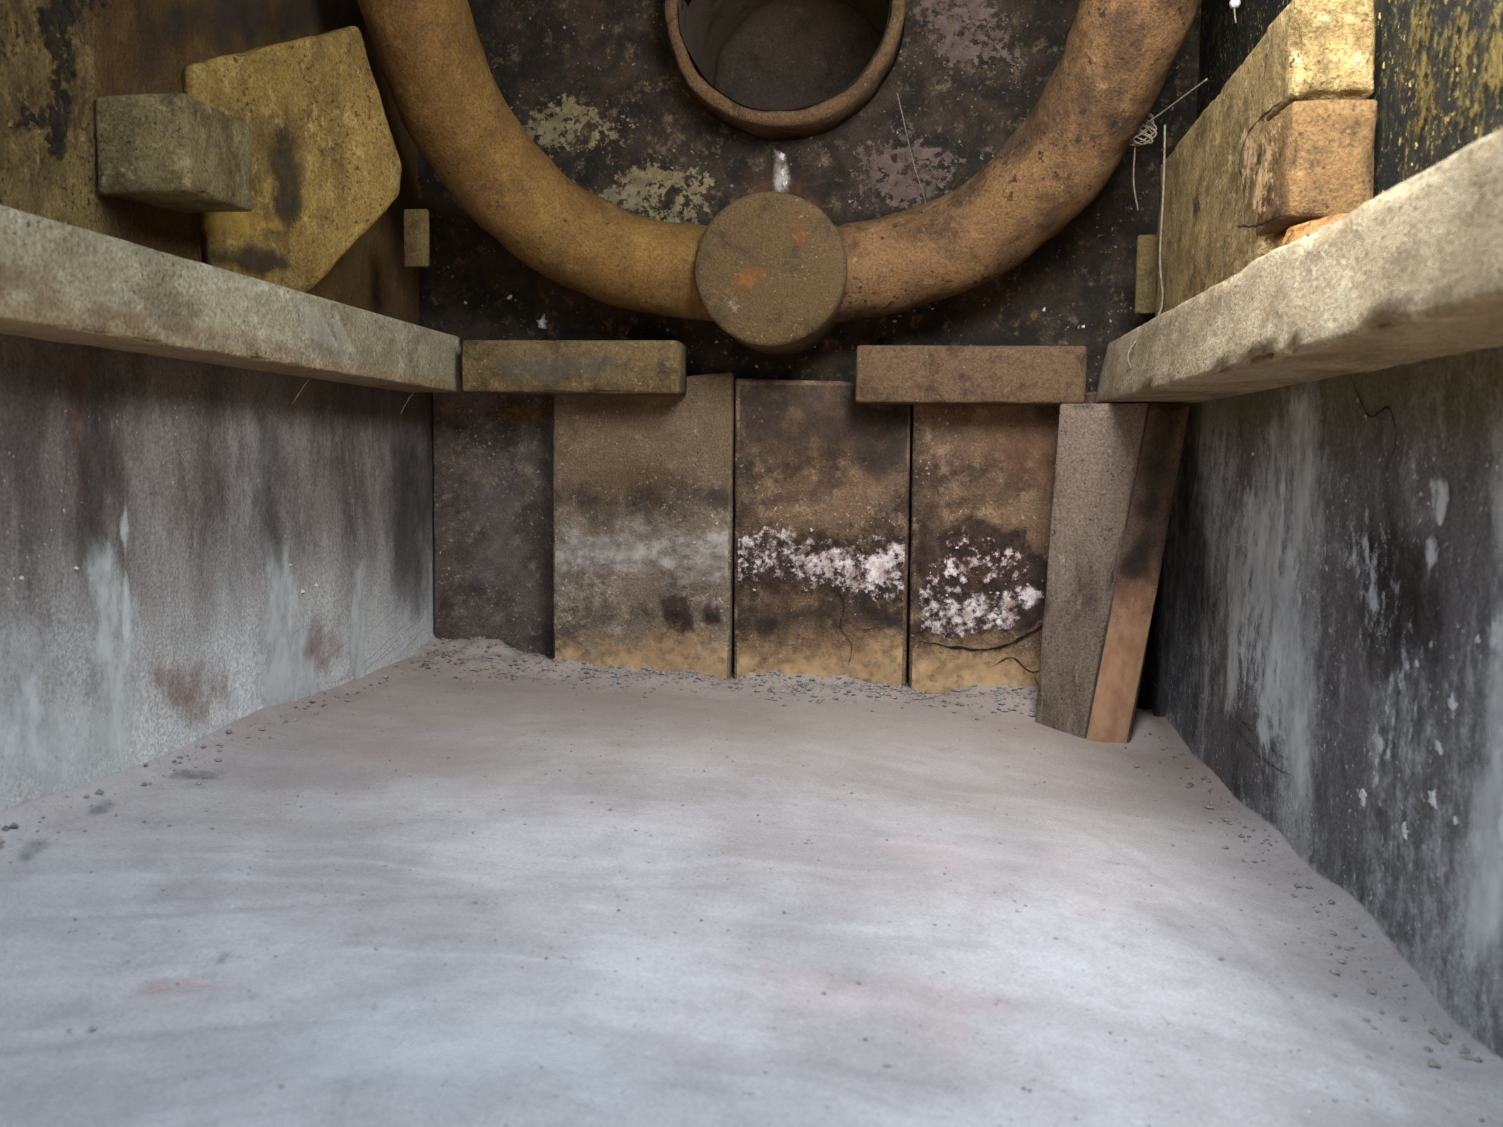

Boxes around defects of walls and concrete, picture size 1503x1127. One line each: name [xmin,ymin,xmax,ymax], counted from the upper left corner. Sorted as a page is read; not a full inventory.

leakage [1405,0,1503,141]
leakage [0,513,136,812]
leakage [261,546,319,708]
leakage [1226,397,1315,809]
leakage [1464,613,1503,965]